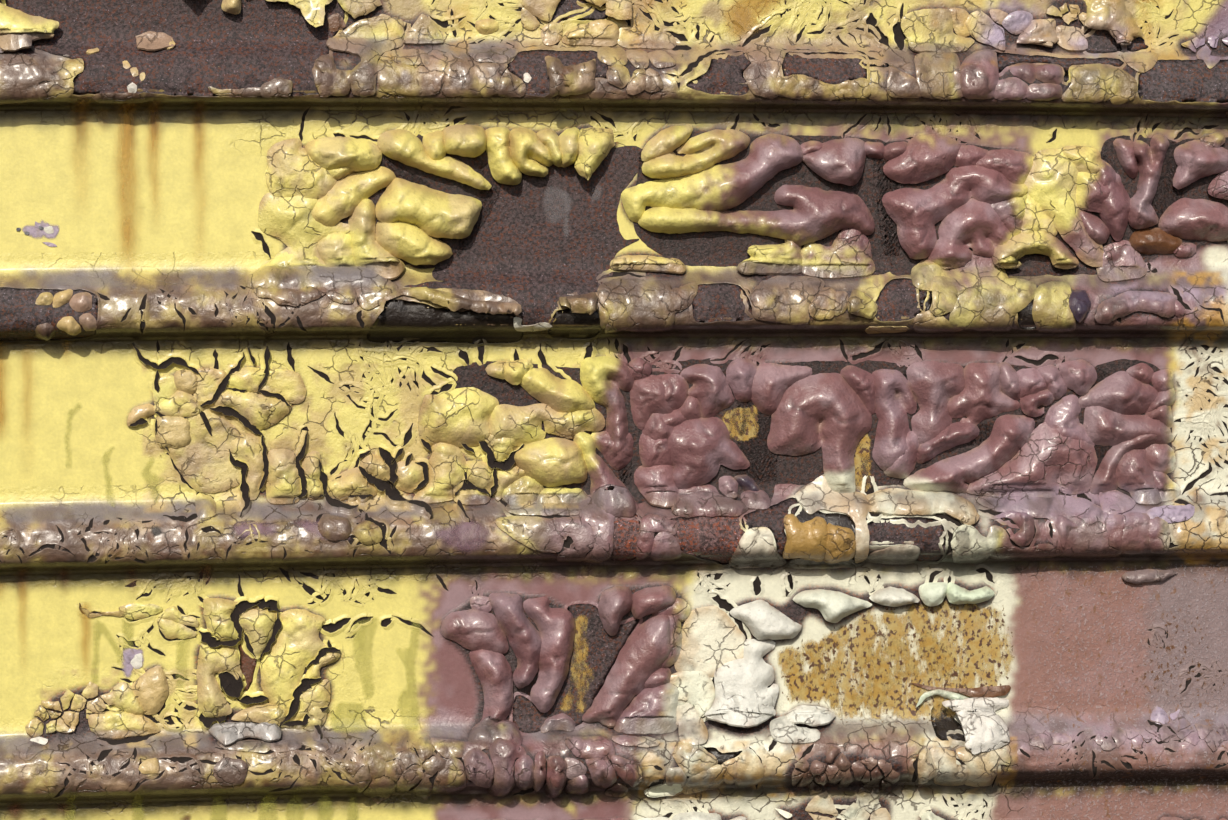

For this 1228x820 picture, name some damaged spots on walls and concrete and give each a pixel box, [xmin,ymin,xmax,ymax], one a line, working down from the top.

peeling [0,0,1228,106]
corrosion [120,112,132,245]
peeling [253,146,1194,347]
crack [1173,301,1228,504]
peeling [343,474,1195,820]
corrosion [779,600,1013,723]
crack [1017,706,1228,778]
peeling [1093,716,1228,752]
peeling [1178,658,1228,697]